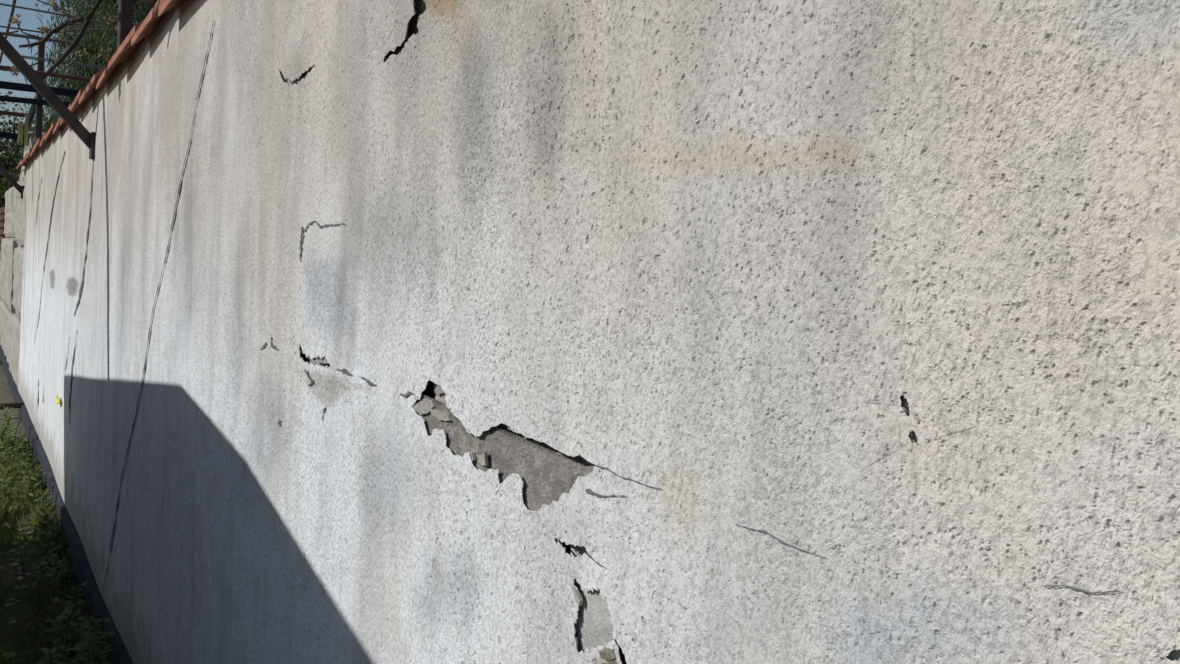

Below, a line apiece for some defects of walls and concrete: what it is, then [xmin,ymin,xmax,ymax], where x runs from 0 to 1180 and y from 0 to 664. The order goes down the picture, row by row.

crack [394,0,429,55]
crack [101,20,214,599]
crack [260,337,278,351]
crack [304,356,376,421]
flaking render [399,383,661,511]